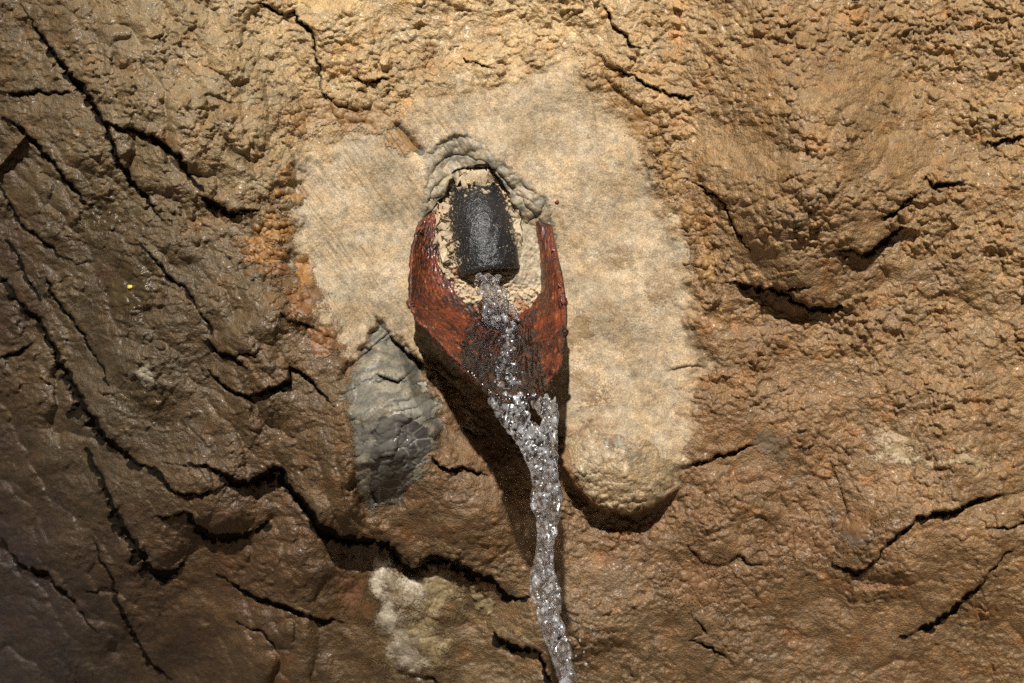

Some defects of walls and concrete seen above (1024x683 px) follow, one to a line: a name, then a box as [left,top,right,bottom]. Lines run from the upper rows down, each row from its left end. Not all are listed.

crack [0,3,259,224]
crack [259,3,348,108]
crack [350,73,387,84]
crack [418,163,510,224]
crack [683,177,751,251]
crack [833,175,966,258]
crack [733,281,843,314]
crack [0,186,530,680]
crack [831,490,1023,577]
damp [320,552,499,683]
crack [492,631,552,683]
crack [899,522,1024,639]